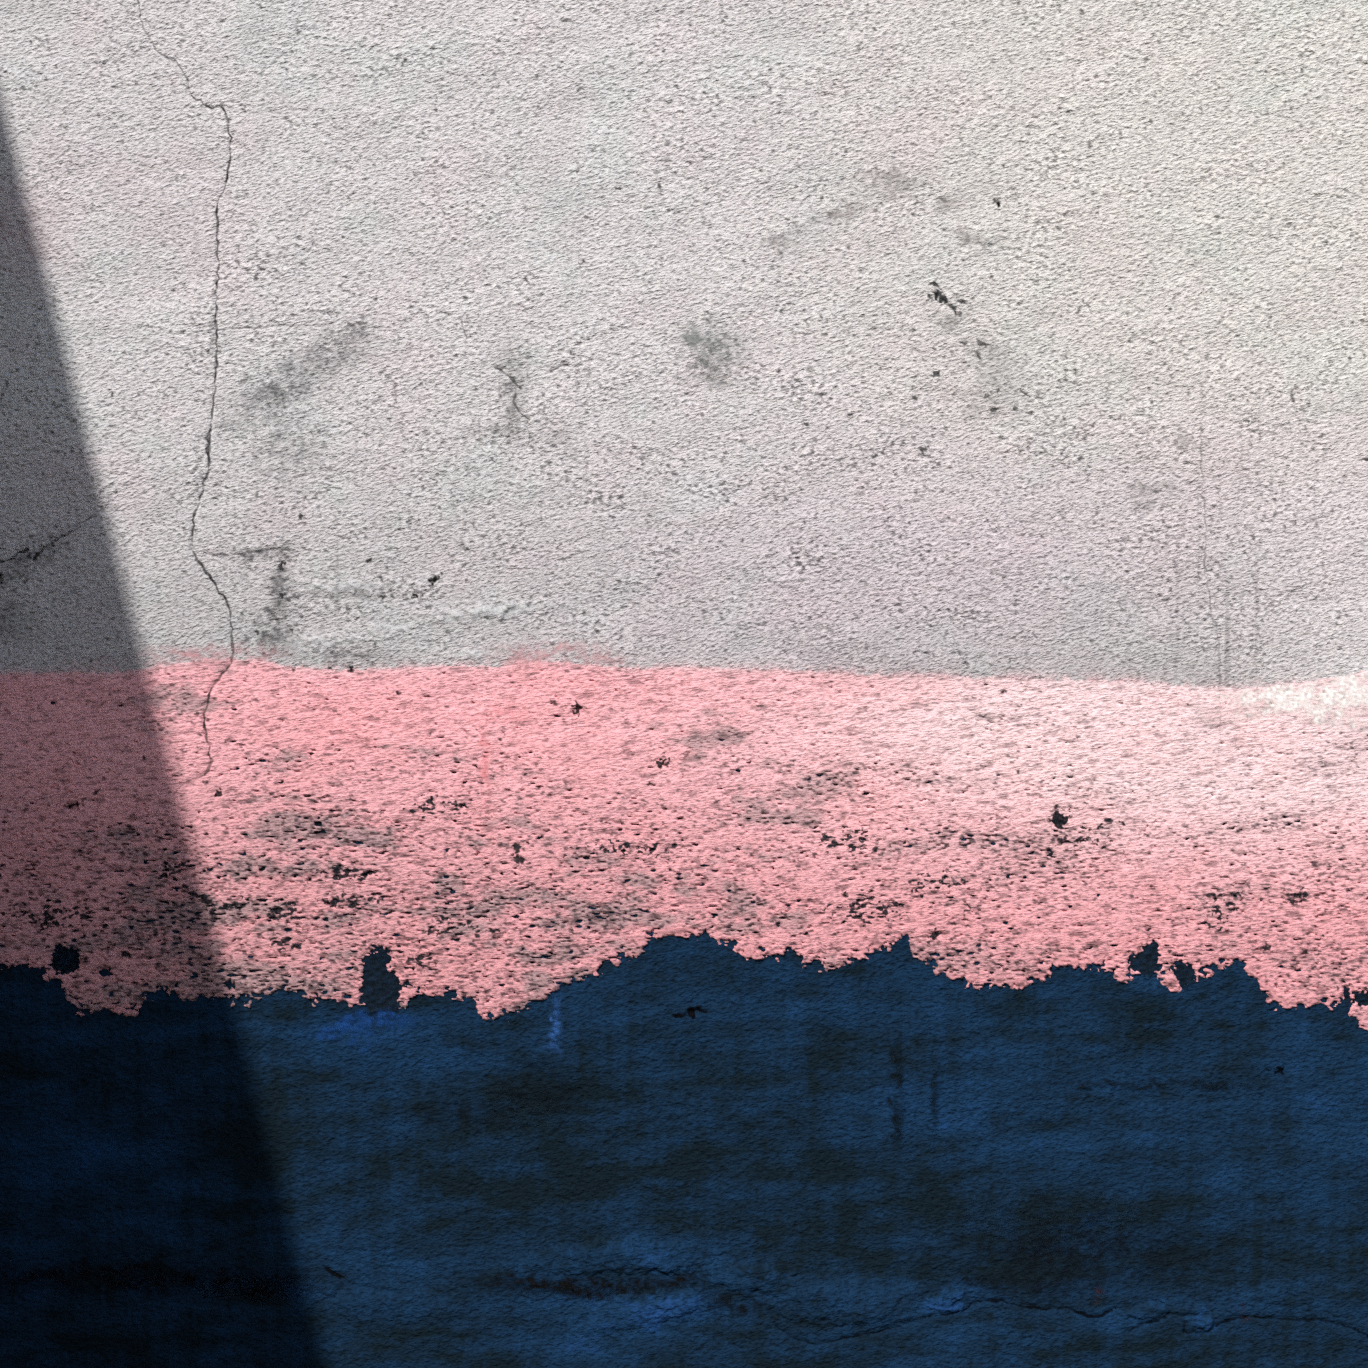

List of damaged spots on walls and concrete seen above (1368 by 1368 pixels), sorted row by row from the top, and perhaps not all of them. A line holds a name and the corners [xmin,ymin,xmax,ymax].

crack [191,96,262,775]